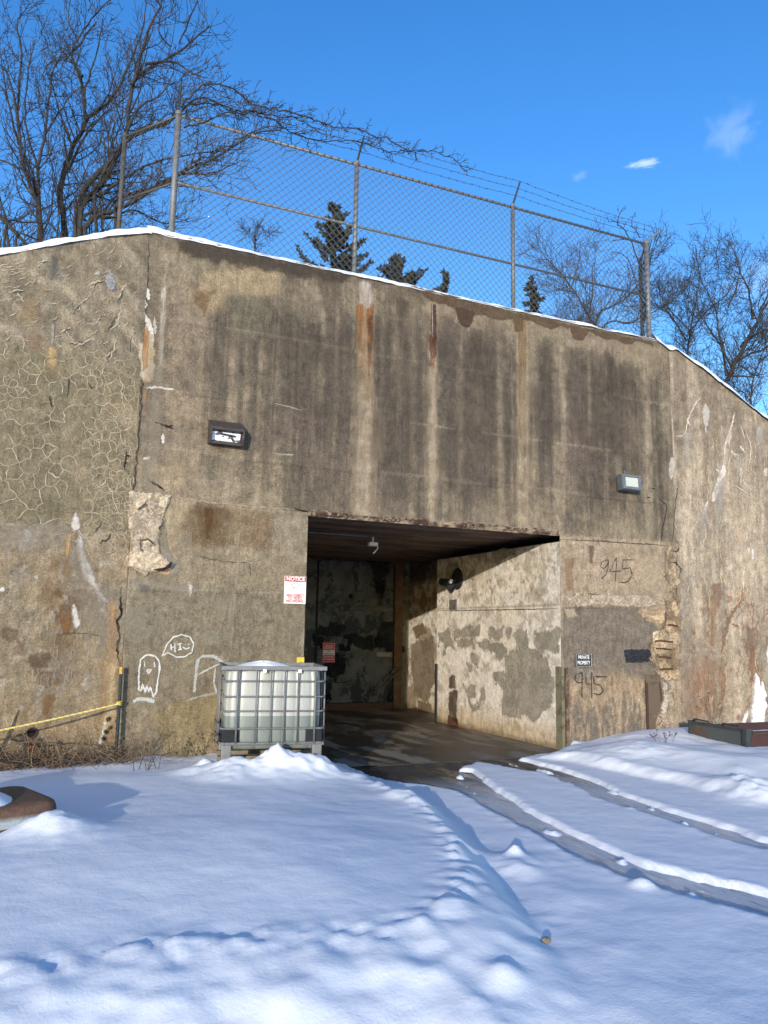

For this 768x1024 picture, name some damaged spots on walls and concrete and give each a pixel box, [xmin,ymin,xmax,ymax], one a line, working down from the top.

water stain [179,238,349,281]
water stain [144,288,166,334]
corrosion [357,281,374,360]
water stain [406,284,653,346]
spalling [125,491,179,576]
crack [0,280,308,661]
peeling [494,548,515,566]
water stain [669,398,768,604]
peeling [313,621,561,726]
spalling [565,541,682,729]